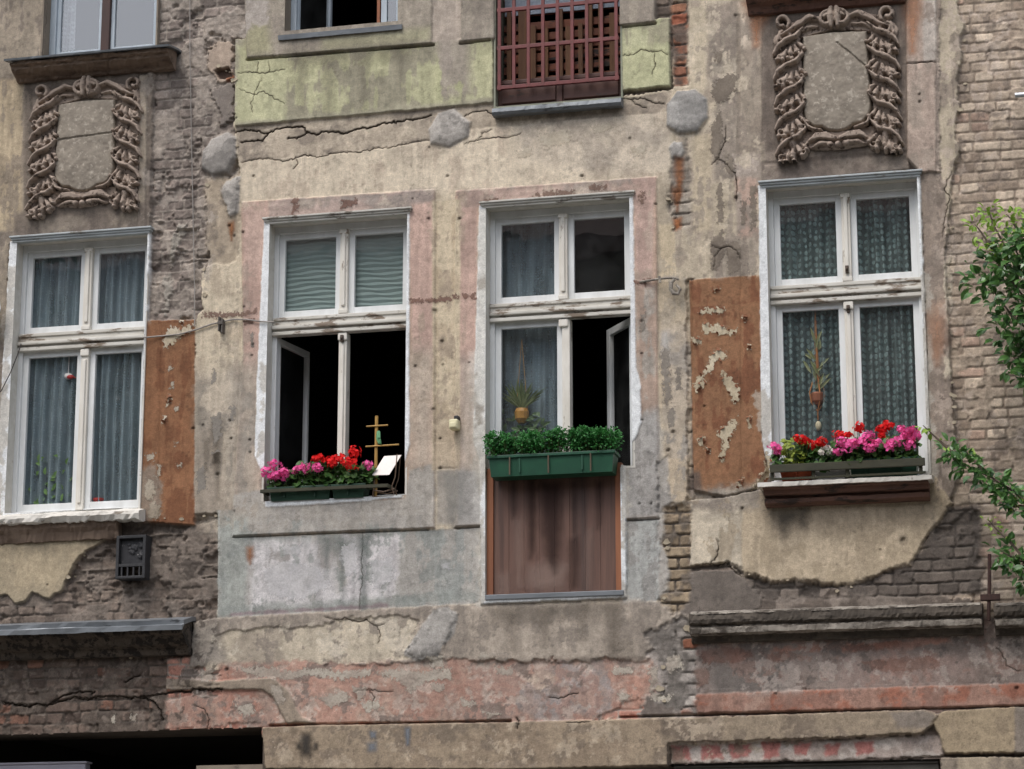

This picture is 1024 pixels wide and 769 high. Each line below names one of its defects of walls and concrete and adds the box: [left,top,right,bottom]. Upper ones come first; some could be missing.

spalling [147,0,257,349]
crack [236,62,432,169]
crack [464,110,521,145]
spalling [666,146,692,230]
crack [712,128,737,198]
peeling [691,306,748,346]
spalling [728,0,1024,608]
peeling [659,348,753,464]
spalling [0,452,219,621]
crack [326,537,382,642]
peeling [0,504,1024,725]
crack [3,675,222,726]